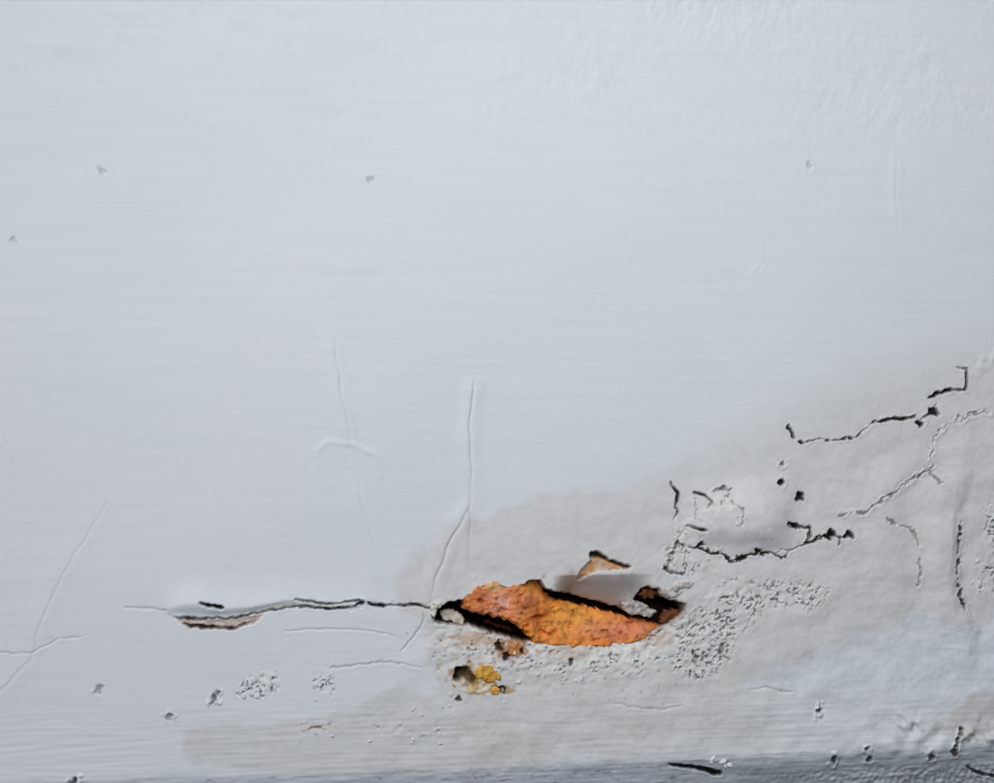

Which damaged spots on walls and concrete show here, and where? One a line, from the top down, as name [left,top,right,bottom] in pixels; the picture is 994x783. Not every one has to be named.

crack [120,595,429,675]
leakage [179,317,994,781]
spalling [403,480,840,709]
crack [658,363,994,591]
crack [952,518,972,617]